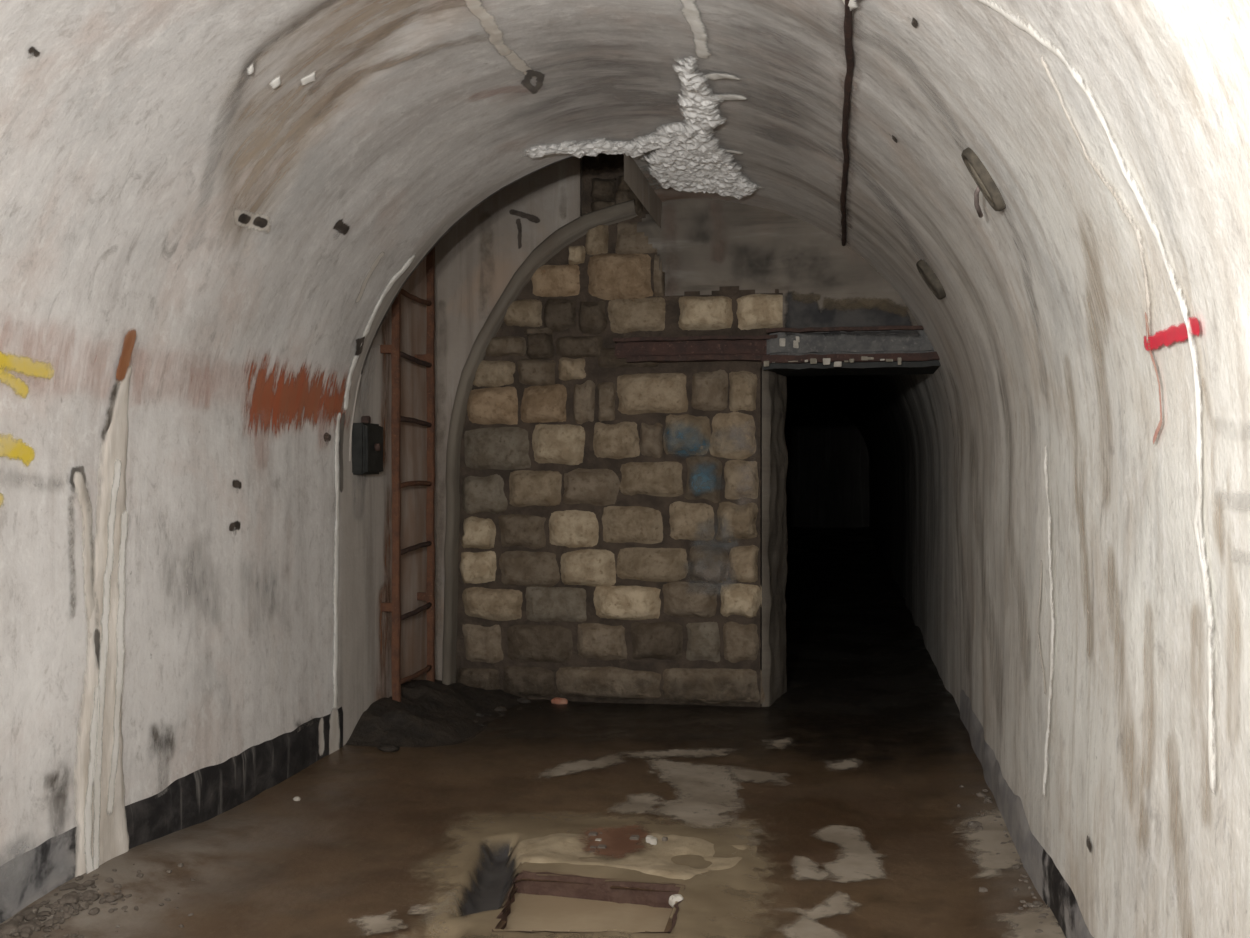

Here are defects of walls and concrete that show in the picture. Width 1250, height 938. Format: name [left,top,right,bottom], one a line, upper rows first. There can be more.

crack [842,0,857,10]
crack [977,0,1236,796]